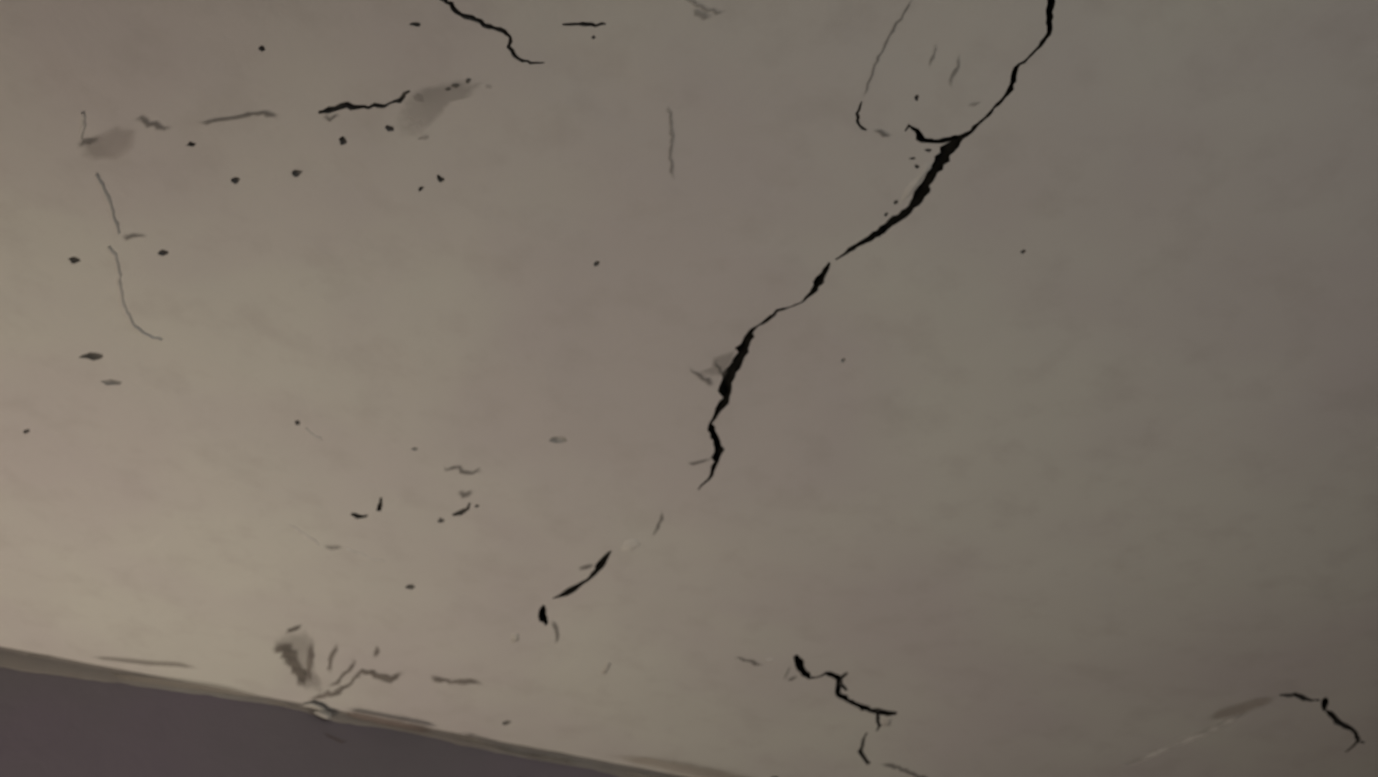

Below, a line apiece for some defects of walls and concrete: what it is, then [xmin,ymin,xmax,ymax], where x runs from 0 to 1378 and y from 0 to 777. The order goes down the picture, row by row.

crack [441,0,545,64]
crack [562,22,606,39]
crack [141,118,163,129]
crack [206,112,273,124]
crack [318,90,410,132]
crack [691,0,1056,490]
crack [538,515,663,641]
crack [740,654,924,777]
crack [1279,692,1365,752]